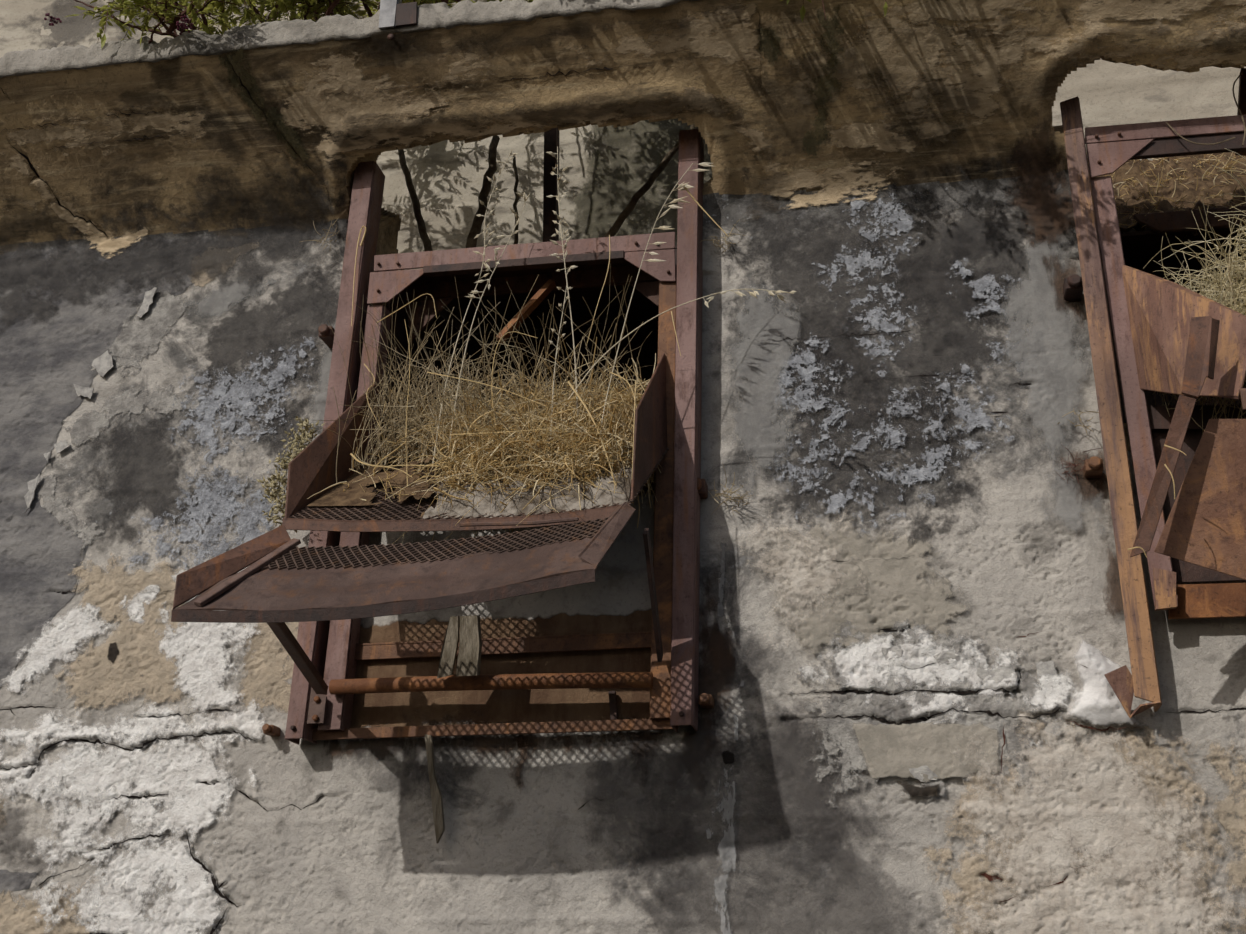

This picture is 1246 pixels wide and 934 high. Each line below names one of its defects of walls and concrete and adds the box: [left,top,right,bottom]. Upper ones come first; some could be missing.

damp [756,27,781,65]
crack [2,109,196,239]
peeling [0,105,259,710]
damp [718,151,1104,630]
crack [0,706,255,775]
spalling [237,622,299,713]
crack [780,663,1140,775]
crack [1169,706,1246,714]
crack [97,794,168,803]
crack [198,781,323,811]
crack [37,834,245,934]
crack [980,873,1016,902]